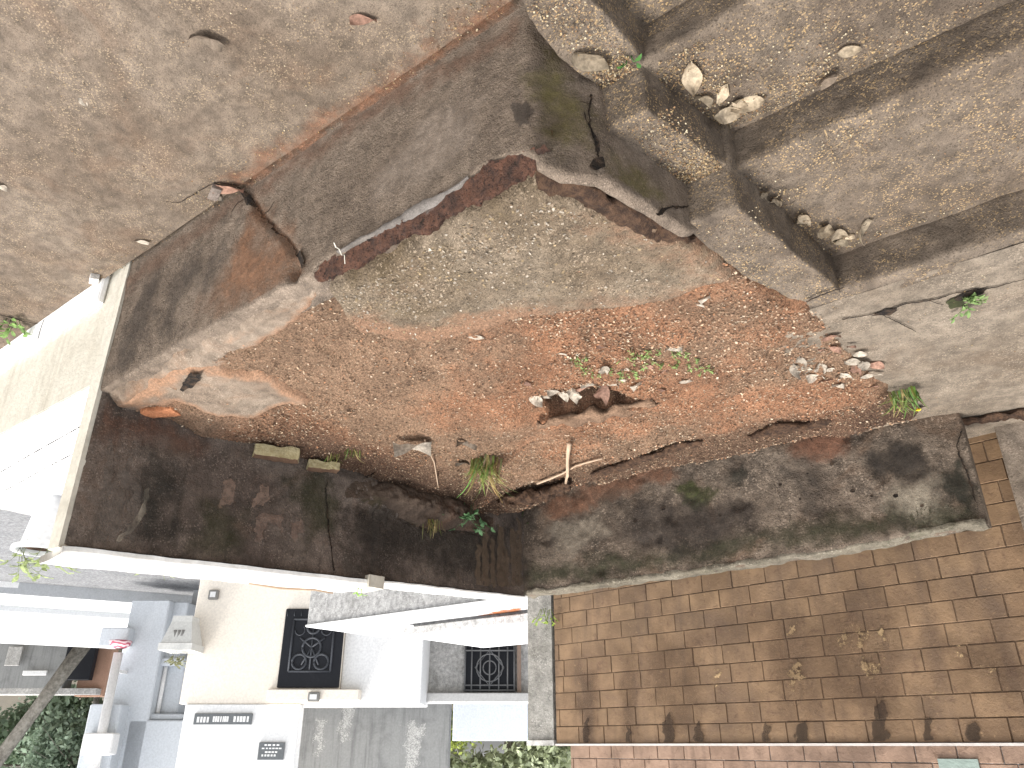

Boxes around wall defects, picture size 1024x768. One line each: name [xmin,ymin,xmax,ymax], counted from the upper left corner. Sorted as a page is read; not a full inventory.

crack [580,94,606,170]
crack [232,187,304,269]
spalling [314,130,553,282]
crack [842,279,1024,332]
spalling [180,373,202,392]
leakage [116,473,172,542]
leakage [865,442,929,480]
leakage [942,460,972,510]